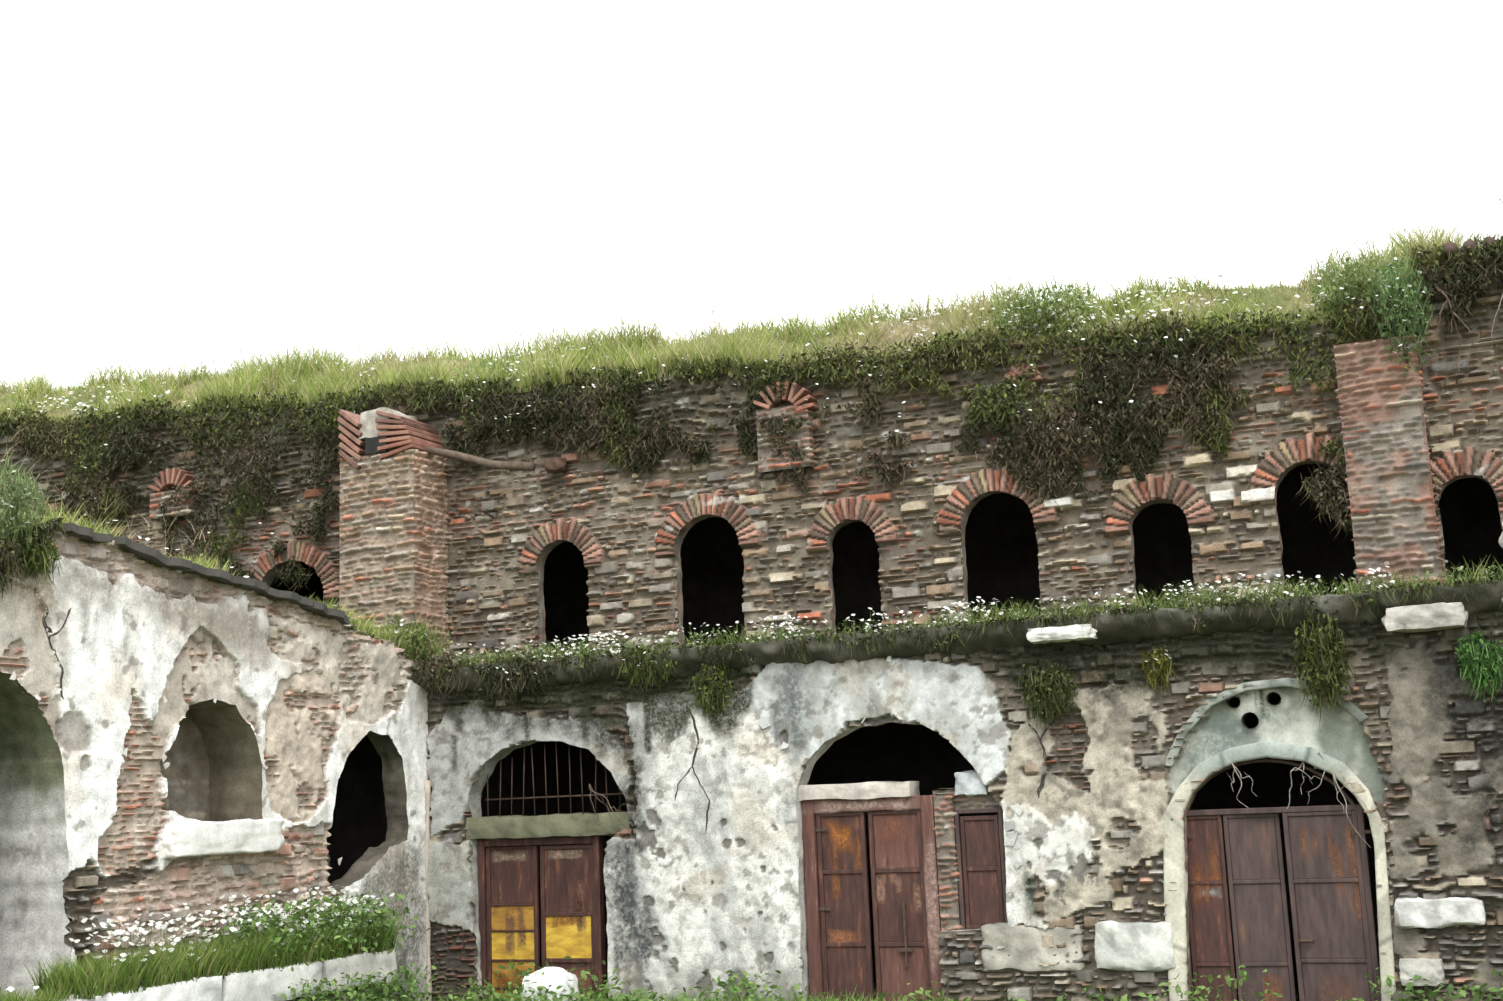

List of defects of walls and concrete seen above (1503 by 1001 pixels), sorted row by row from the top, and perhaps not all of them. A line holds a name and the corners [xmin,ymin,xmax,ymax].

peeling [0,550,93,772]
spalling [98,614,409,876]
spalling [758,716,789,750]
spalling [1043,707,1090,792]
hole [635,809,665,859]
hole [719,820,745,849]
spalling [1004,803,1094,905]
hole [642,895,655,907]
hole [648,928,678,972]
hole [696,967,750,1001]